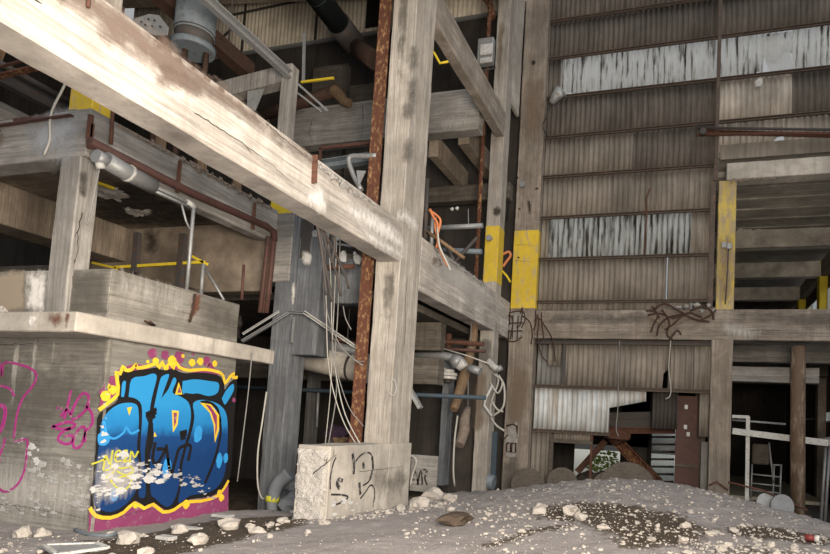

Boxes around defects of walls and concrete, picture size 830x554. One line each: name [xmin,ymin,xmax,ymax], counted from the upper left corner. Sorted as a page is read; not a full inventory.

peeling [0,438,216,516]